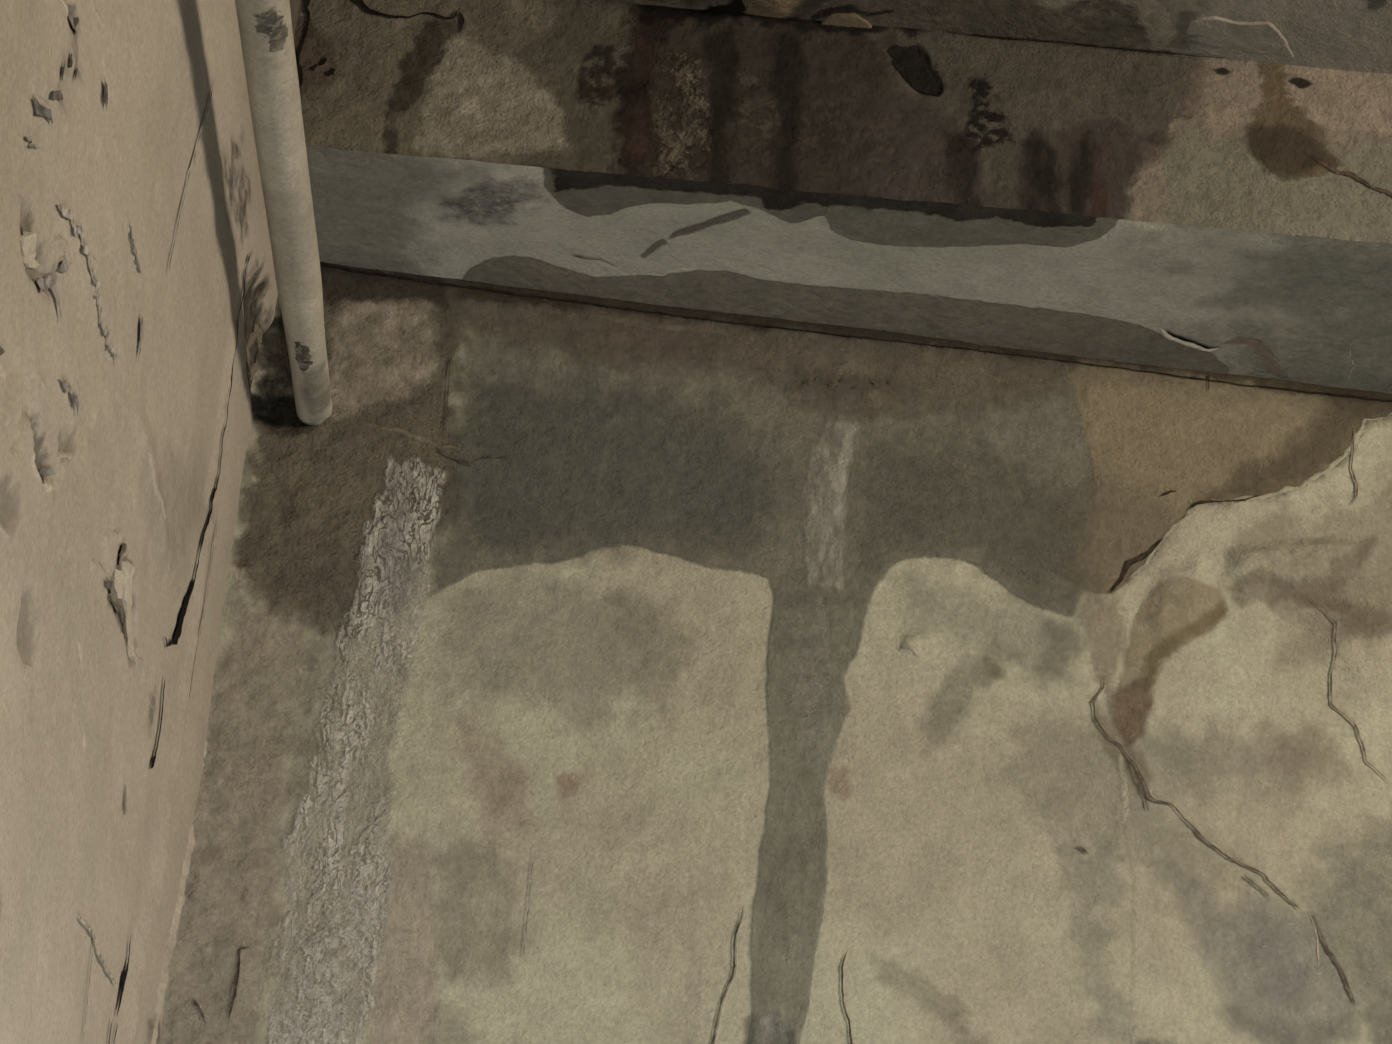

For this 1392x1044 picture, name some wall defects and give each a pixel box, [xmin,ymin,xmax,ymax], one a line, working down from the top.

flaking render [20,232,40,268]
flaking render [124,214,143,297]
leakage [289,0,1097,285]
leakage [579,9,1208,247]
flaking render [30,420,55,493]
flaking render [113,554,136,670]
crack [151,252,251,769]
leakage [160,265,462,1044]
leakage [435,58,1392,1044]
crack [1091,678,1355,1006]
crack [108,937,131,1044]
crack [838,952,853,1044]